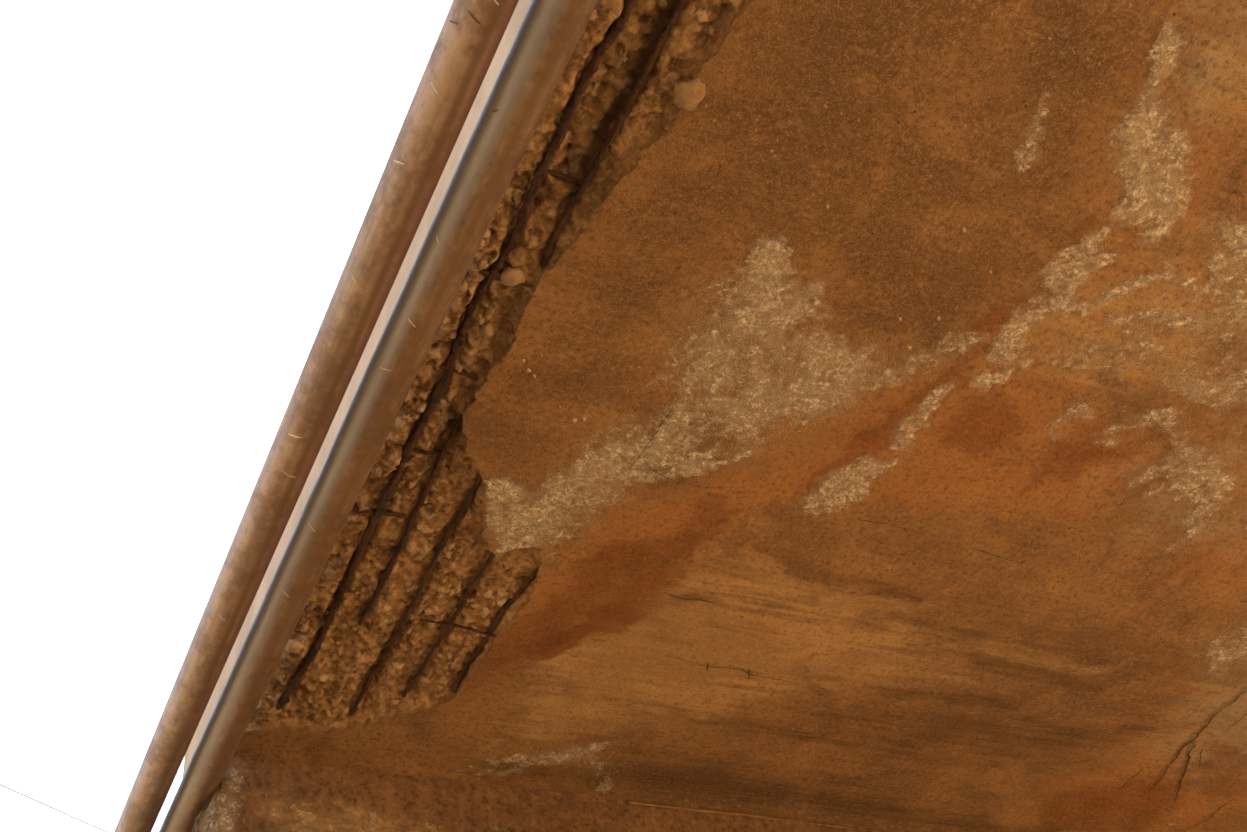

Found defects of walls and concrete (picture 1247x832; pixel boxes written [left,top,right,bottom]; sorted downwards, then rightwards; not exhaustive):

spalling [247,0,749,731]
leakage [485,23,1247,553]
crack [1116,690,1247,802]